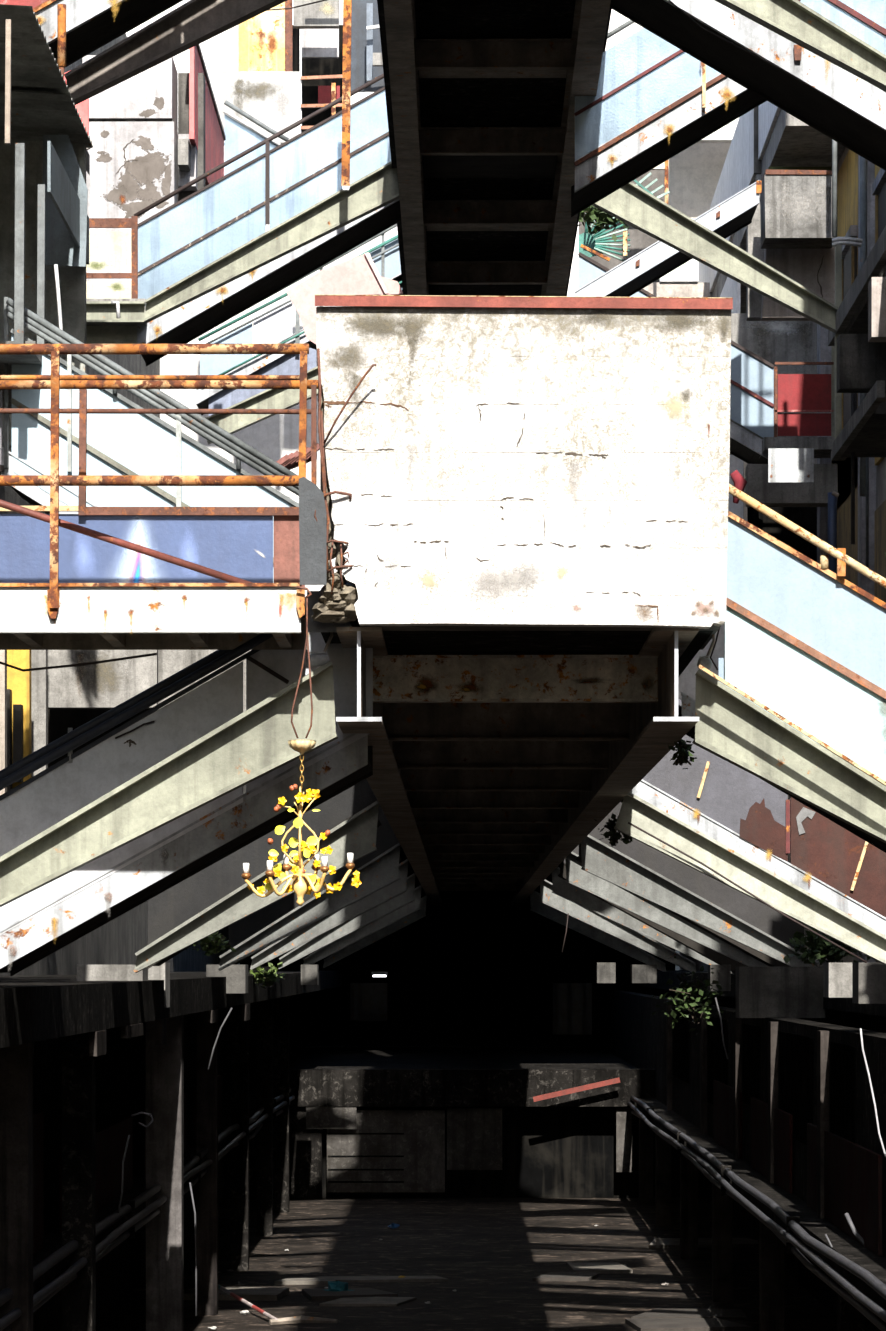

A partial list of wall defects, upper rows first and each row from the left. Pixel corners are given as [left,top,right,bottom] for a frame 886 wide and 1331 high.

corrosion [258,31,276,53]